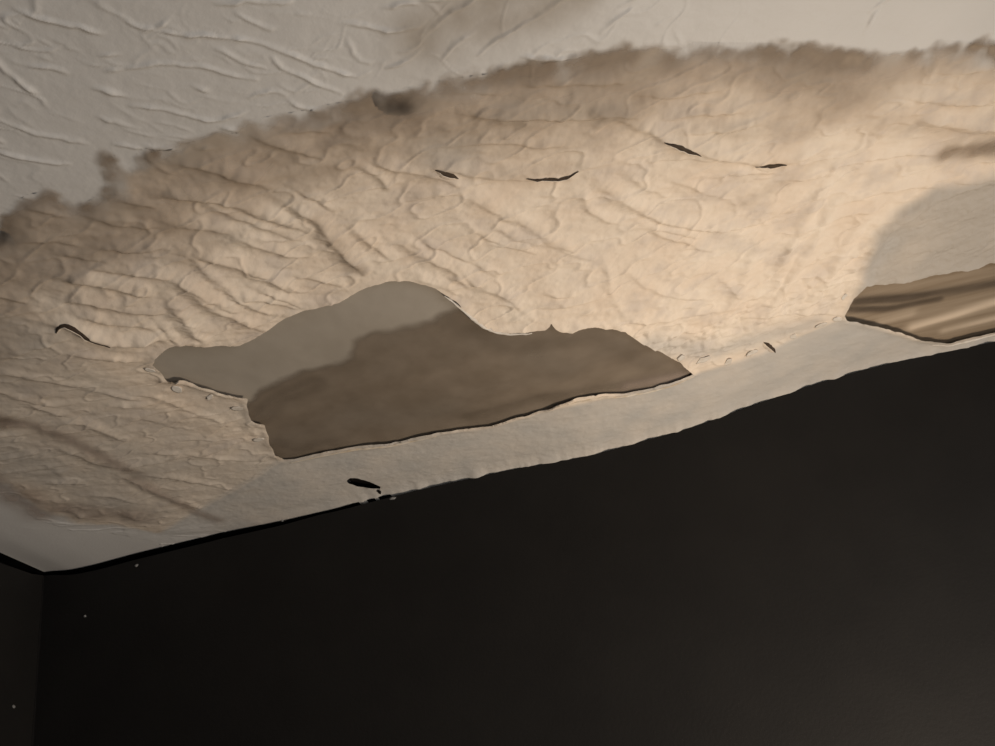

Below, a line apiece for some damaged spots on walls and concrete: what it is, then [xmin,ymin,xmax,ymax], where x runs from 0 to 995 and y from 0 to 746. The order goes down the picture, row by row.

peeling [144,281,711,463]
peeling [815,263,995,347]